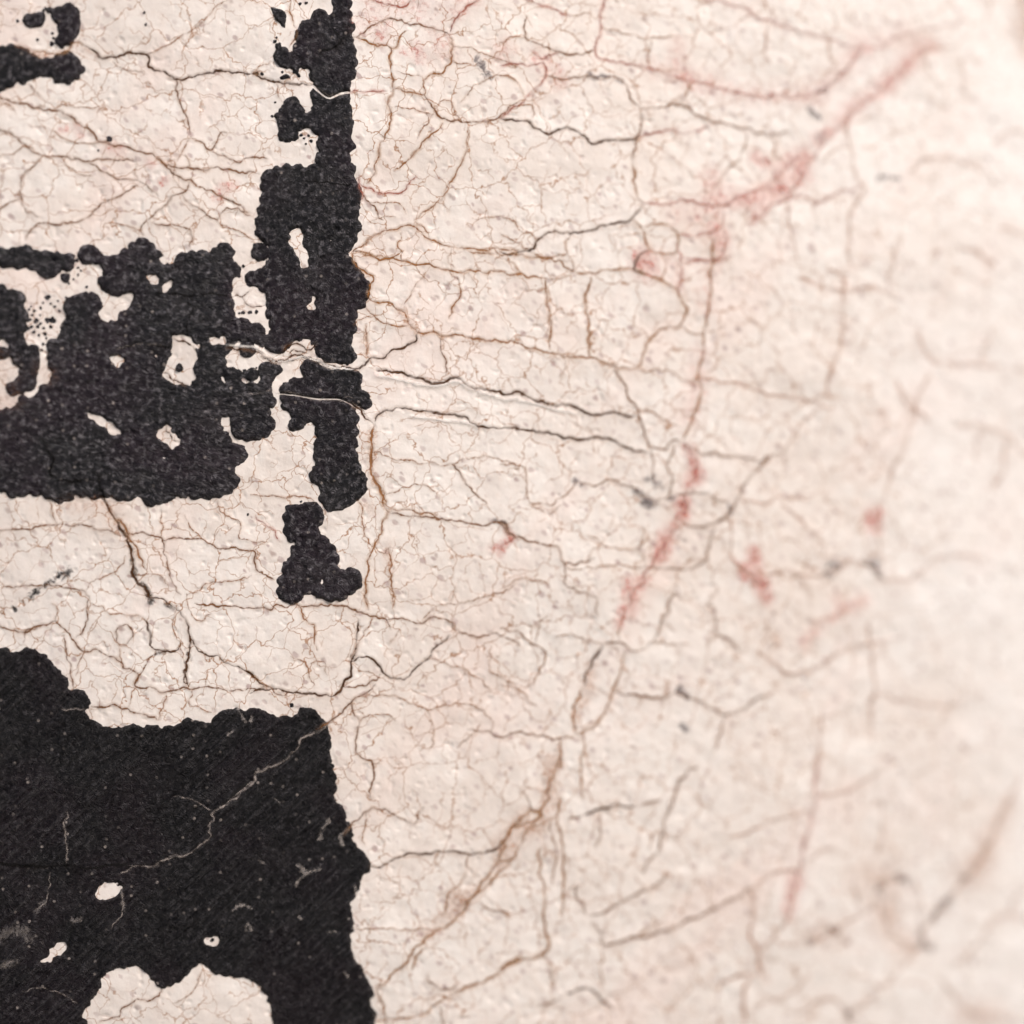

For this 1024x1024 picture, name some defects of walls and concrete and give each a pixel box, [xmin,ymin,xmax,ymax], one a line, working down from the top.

crack [0,1,330,245]
peeling [0,0,372,605]
crack [117,292,262,350]
crack [227,0,821,613]
peeling [0,647,377,1024]
crack [0,441,764,1024]
crack [707,597,803,676]
crack [721,831,815,1023]